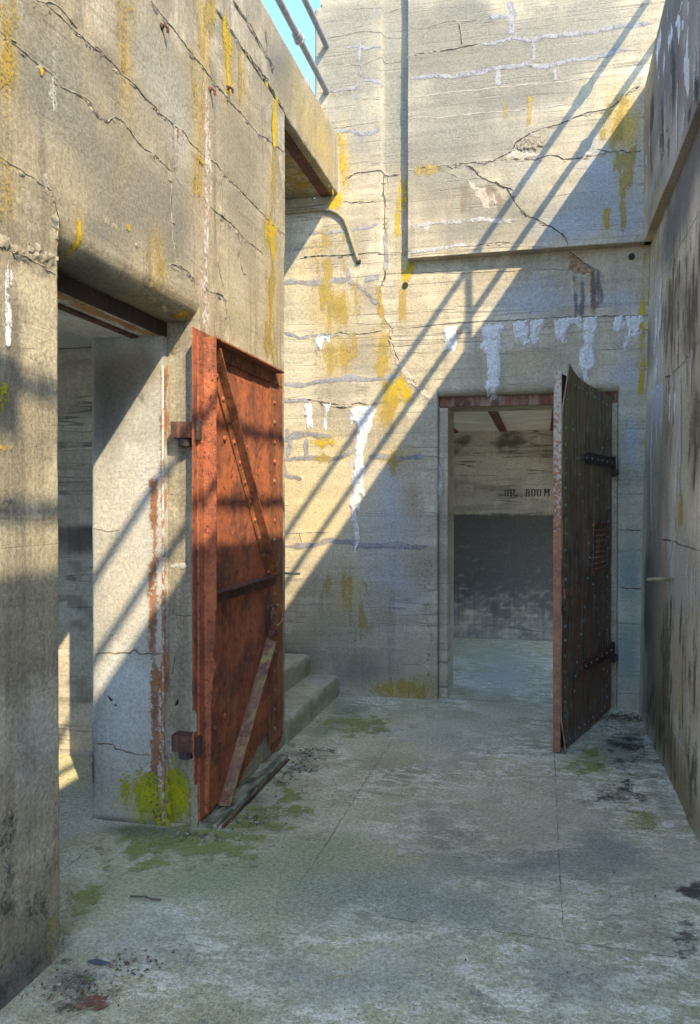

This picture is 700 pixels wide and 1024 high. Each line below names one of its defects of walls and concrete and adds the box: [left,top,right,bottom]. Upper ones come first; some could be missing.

water stain [5,268,13,346]
crack [0,0,285,323]
water stain [443,326,457,353]
crack [284,57,656,409]
water stain [480,272,603,401]
water stain [603,3,699,231]
water stain [346,405,376,553]
rust [146,366,169,823]